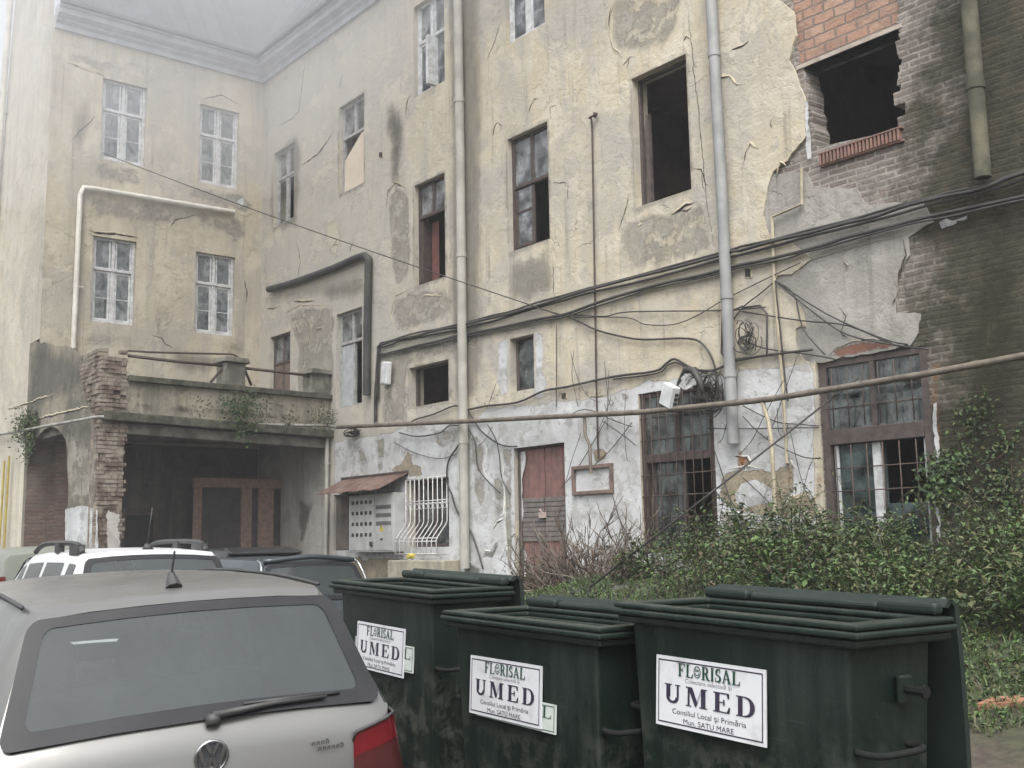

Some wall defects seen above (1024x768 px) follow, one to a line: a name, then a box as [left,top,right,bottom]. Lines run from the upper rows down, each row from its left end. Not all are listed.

flaking render [607,0,679,55]
crack [303,129,335,165]
water stain [388,112,400,175]
crack [671,2,713,258]
flaking render [826,337,896,359]
flaking render [358,439,422,476]
flaking render [465,437,526,573]
peeling [723,479,810,550]